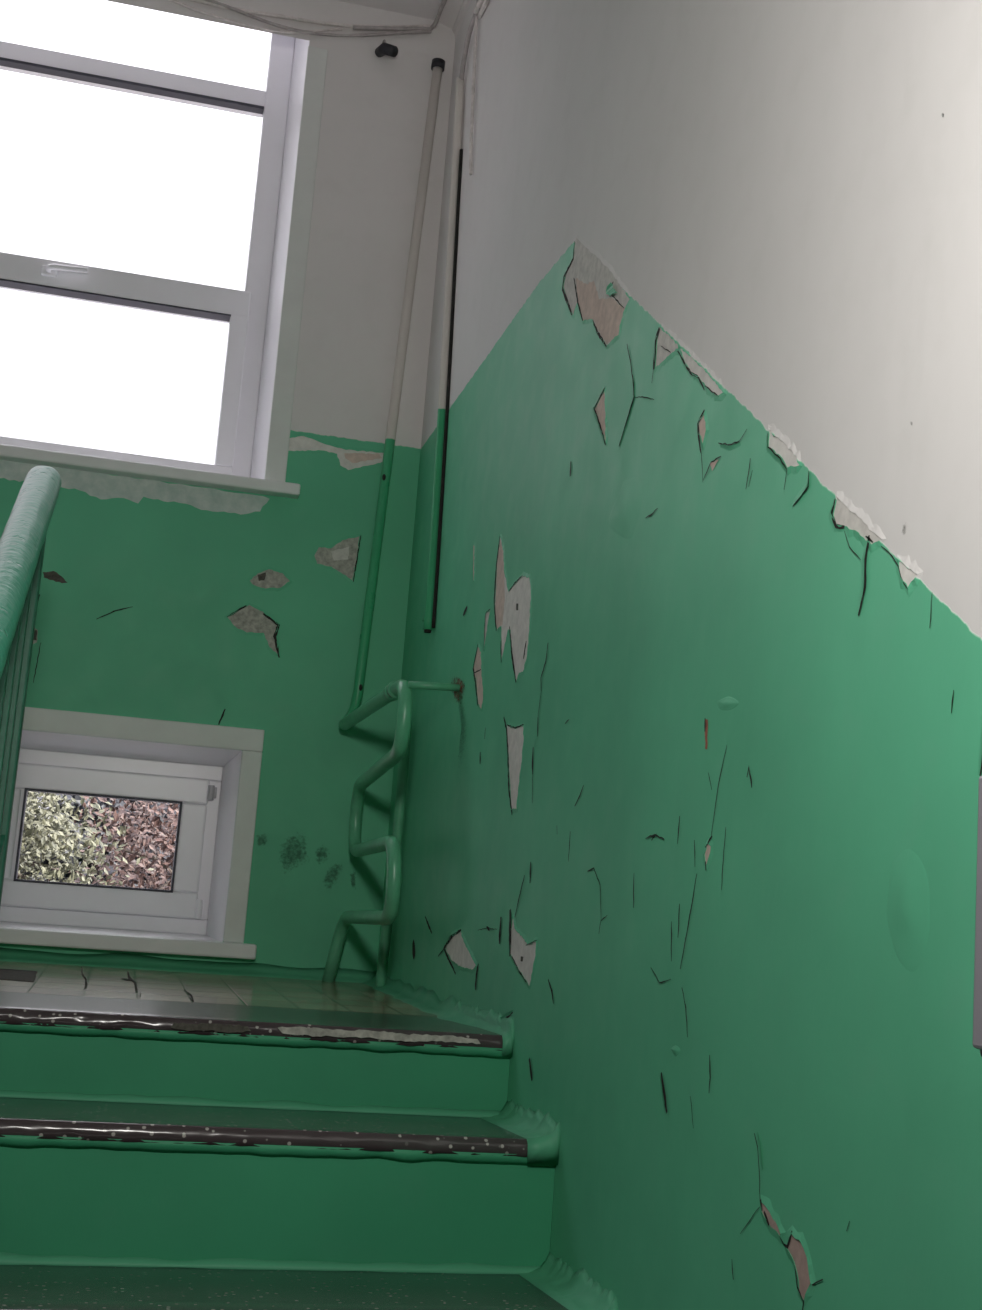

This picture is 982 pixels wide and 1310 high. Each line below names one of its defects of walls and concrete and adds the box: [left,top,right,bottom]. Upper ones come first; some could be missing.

peeling [562,234,632,349]
peeling [288,433,386,481]
peeling [651,322,727,480]
peeling [766,423,802,487]
peeling [828,491,924,598]
peeling [224,566,292,658]
peeling [473,534,533,712]
peeling [504,718,526,814]
peeling [509,875,538,989]
crack [568,840,634,930]
crack [645,745,752,1123]
peeling [740,1133,823,1310]